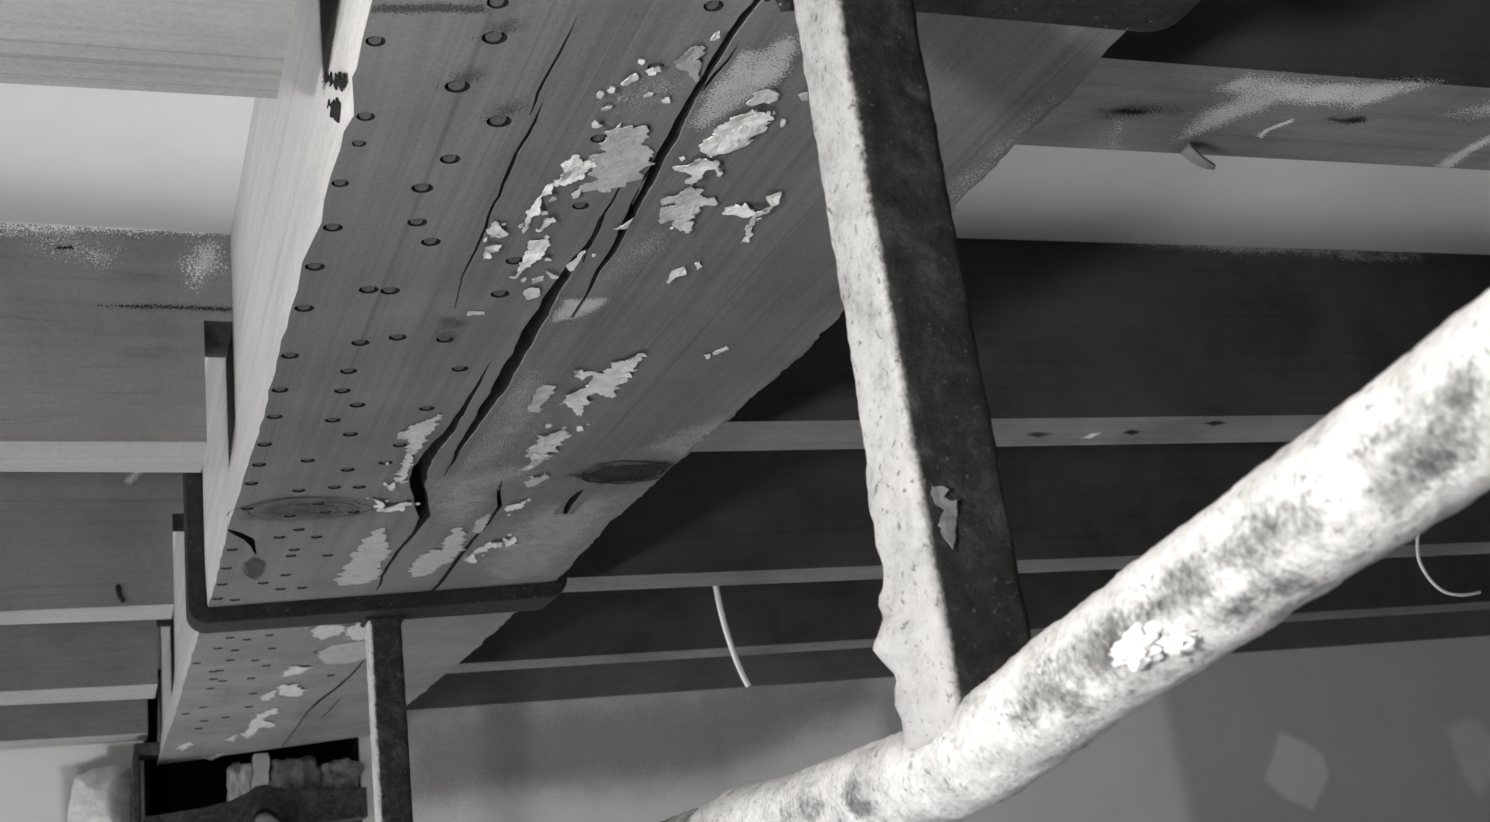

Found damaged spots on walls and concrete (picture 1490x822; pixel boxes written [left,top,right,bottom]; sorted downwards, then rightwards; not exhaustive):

peeling [483,31,786,300]
crack [376,0,762,591]
peeling [332,414,443,586]
peeling [407,353,647,577]
spalling [143,623,366,817]
crack [282,659,366,747]